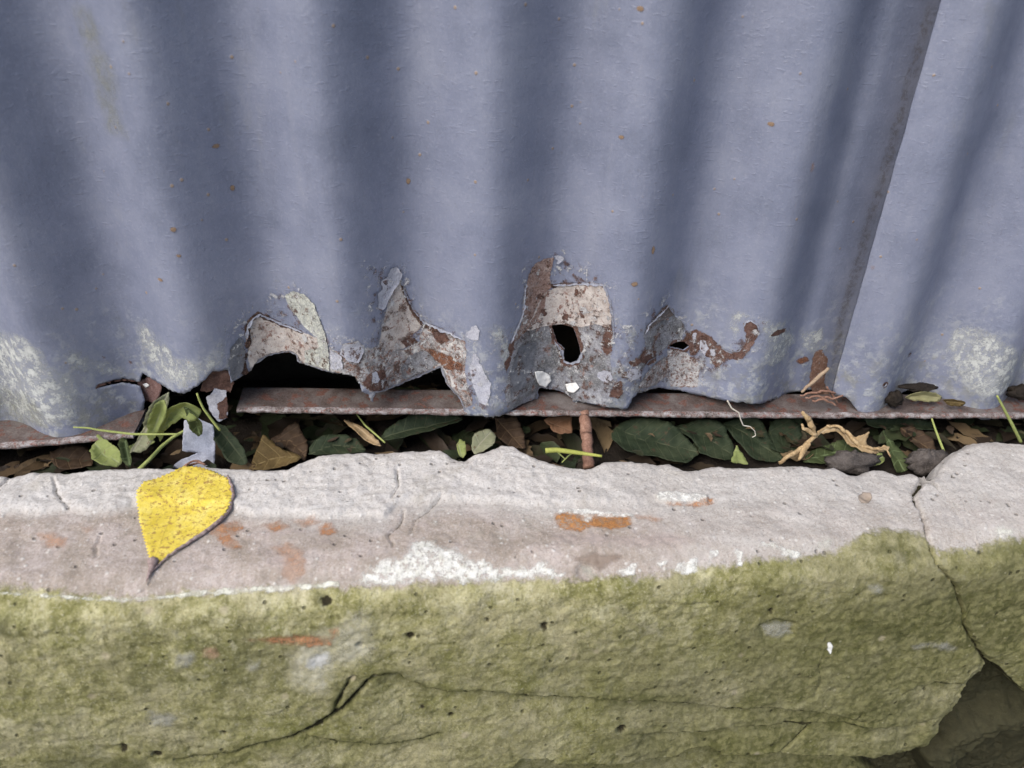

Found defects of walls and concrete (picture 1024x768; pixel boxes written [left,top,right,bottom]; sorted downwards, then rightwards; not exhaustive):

water stain [0,335,77,427]
water stain [141,328,222,384]
peeling [363,260,491,406]
peeling [509,250,626,399]
rust [501,296,785,406]
peeling [666,348,700,388]
water stain [950,329,1024,395]
rust [555,508,632,532]
crack [912,480,930,552]
efflorescence [362,541,563,585]
crack [951,582,1022,689]
crack [286,673,387,741]